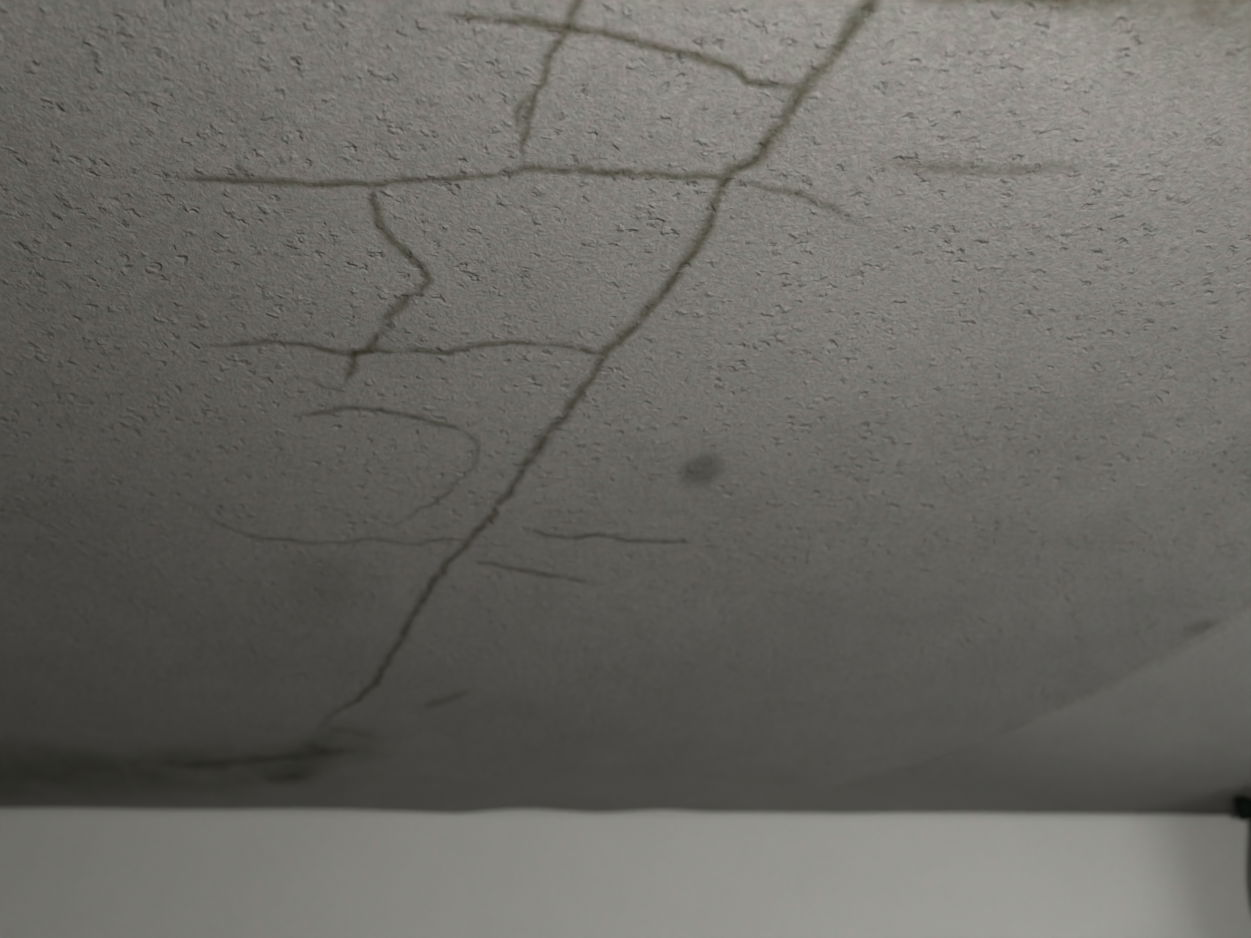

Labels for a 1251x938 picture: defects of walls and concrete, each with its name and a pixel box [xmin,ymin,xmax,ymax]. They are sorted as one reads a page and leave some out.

crack [512,133,772,491]